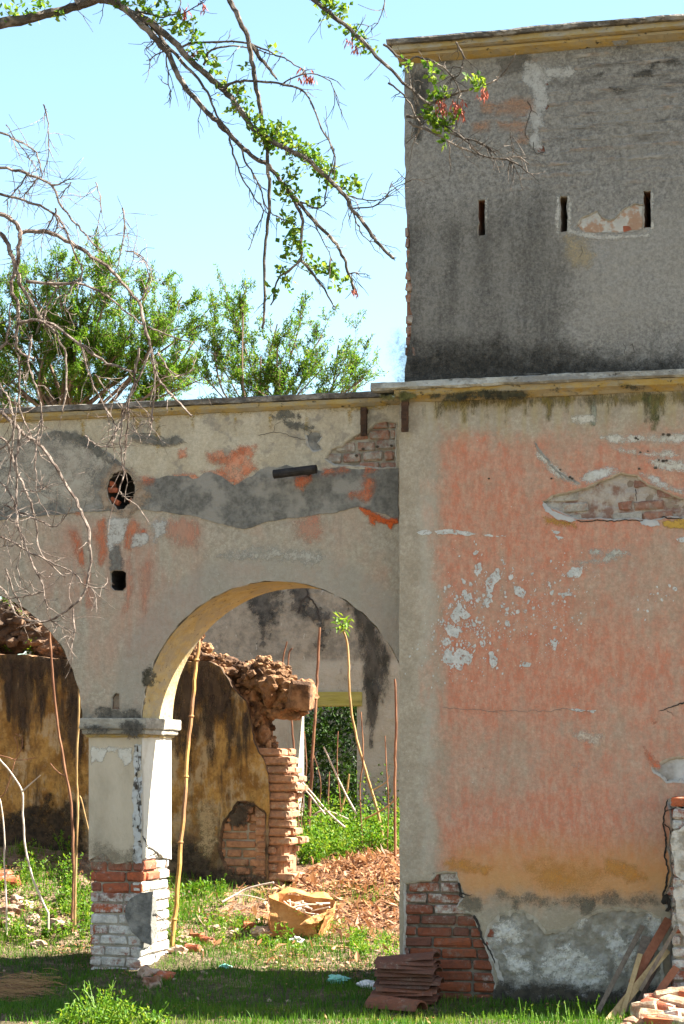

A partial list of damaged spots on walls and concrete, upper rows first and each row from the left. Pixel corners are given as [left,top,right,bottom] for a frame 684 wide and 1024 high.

peeling [554,188,654,240]
water stain [348,337,684,429]
peeling [0,420,399,551]
flaking render [537,433,684,540]
water stain [0,655,144,780]
water stain [174,665,248,782]
water stain [247,588,331,651]
water stain [347,603,390,747]
peeling [409,529,631,689]
flaking render [90,744,170,970]
water stain [171,839,265,888]
flaking render [403,796,684,999]